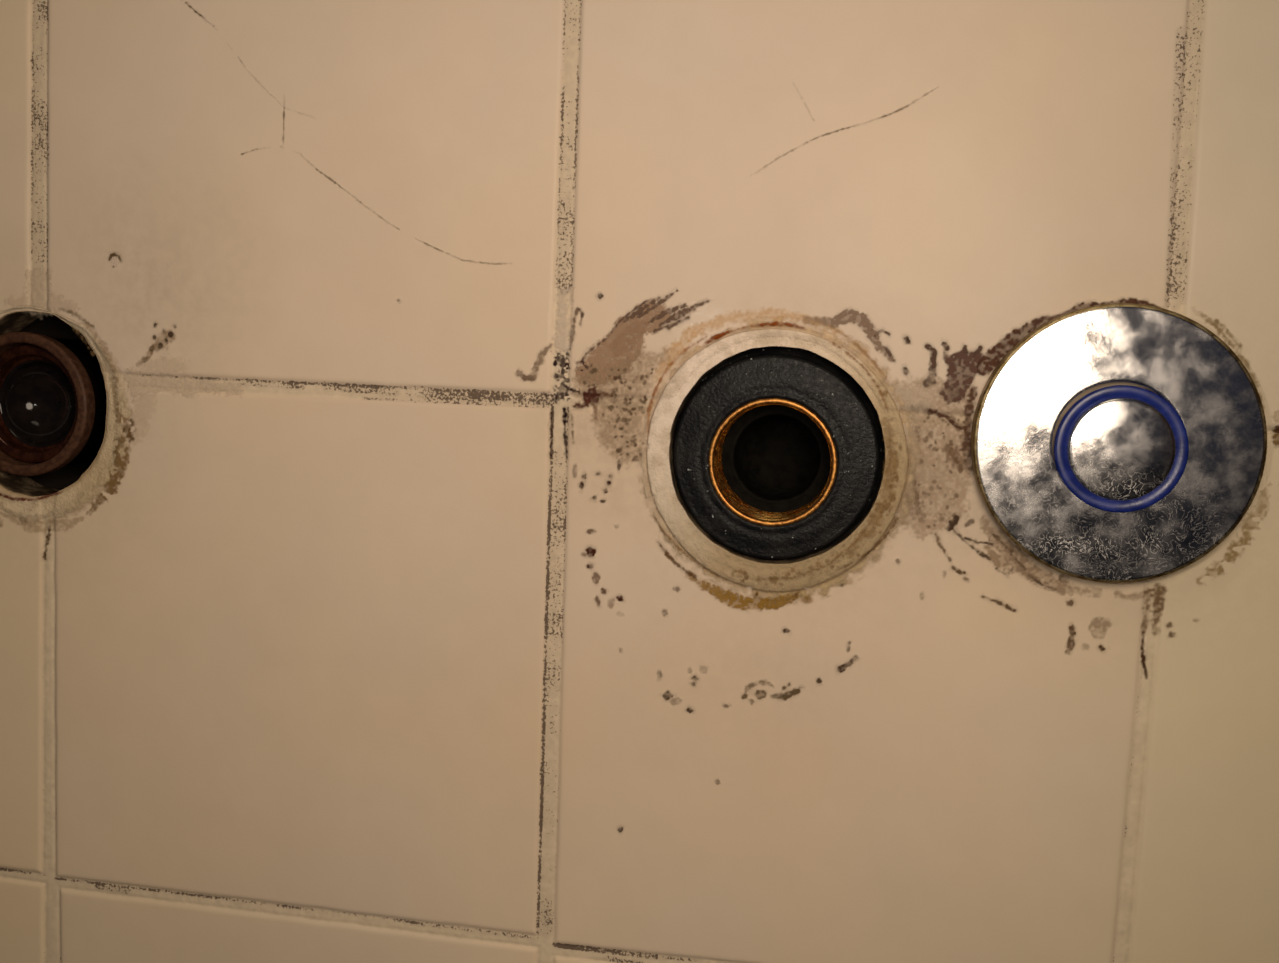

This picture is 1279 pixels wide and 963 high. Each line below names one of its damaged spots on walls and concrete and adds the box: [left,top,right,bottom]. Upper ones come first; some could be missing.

water stain [543,290,709,459]
corrosion [93,409,134,510]
water stain [910,387,977,470]
water stain [586,529,623,604]
water stain [948,515,1043,585]
water stain [1066,625,1076,652]
water stain [1141,584,1173,678]
water stain [742,681,800,700]